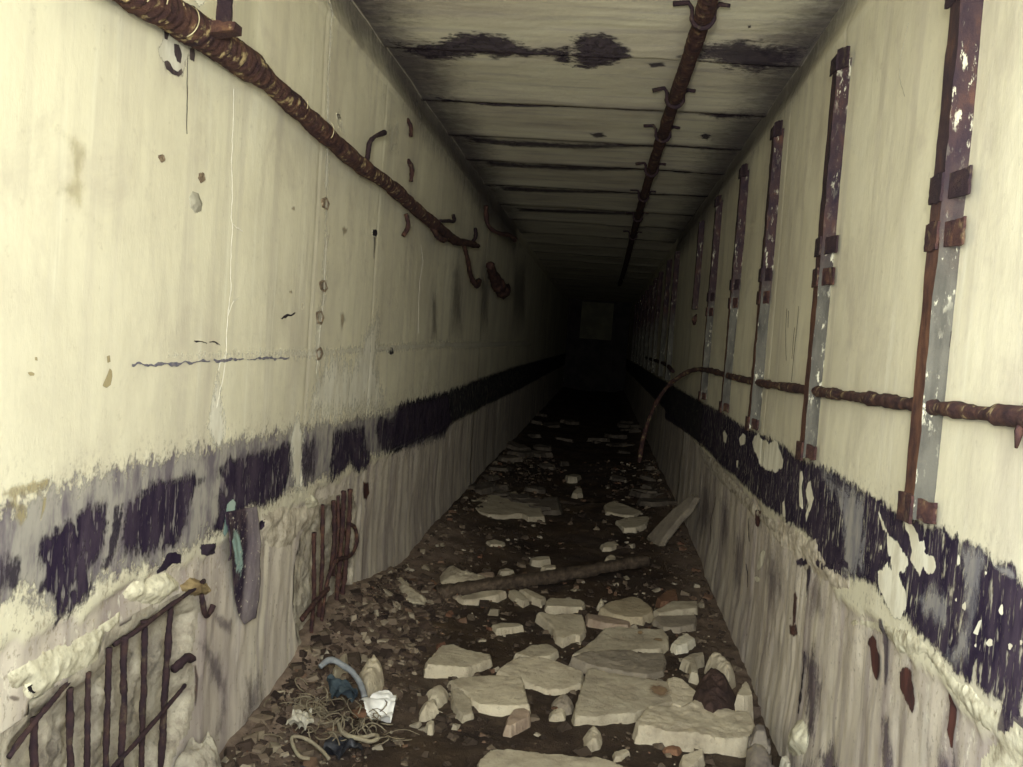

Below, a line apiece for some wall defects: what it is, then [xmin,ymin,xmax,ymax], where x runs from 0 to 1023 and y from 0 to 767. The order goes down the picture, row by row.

damp [400,31,632,69]
damp [697,39,787,73]
damp [204,315,530,492]
rust [1014,424,1023,449]
damp [824,468,867,580]
spalling [0,579,216,767]
rust [868,636,880,680]
rust [900,667,915,713]
damp [882,718,893,767]
rust [947,694,957,748]
spalling [981,716,1023,767]
damp [997,710,1023,734]